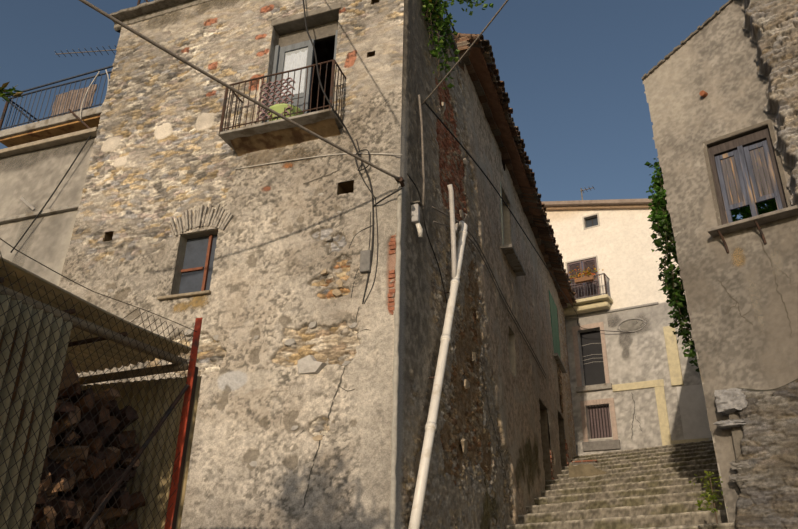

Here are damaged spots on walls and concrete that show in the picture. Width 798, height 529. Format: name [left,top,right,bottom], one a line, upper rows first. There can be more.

flaking render [435,76,468,224]
flaking render [311,228,352,299]
peeling [389,233,397,255]
peeling [387,270,396,315]
flaking render [145,329,226,378]
flaking render [272,321,361,375]